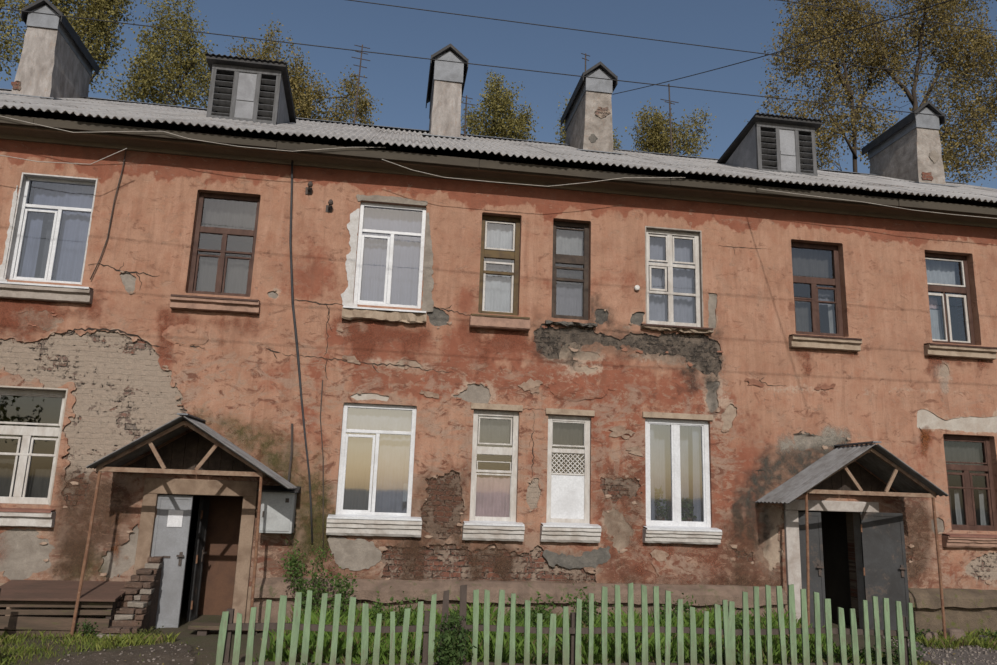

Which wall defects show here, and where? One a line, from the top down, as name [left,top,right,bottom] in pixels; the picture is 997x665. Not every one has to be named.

crack [89,263,157,291]
flaking render [0,307,187,509]
crack [266,299,448,378]
flaking render [533,293,737,432]
flaking render [379,470,596,582]
flaking render [600,475,642,553]
water stain [733,427,850,560]
flaking render [965,551,997,585]